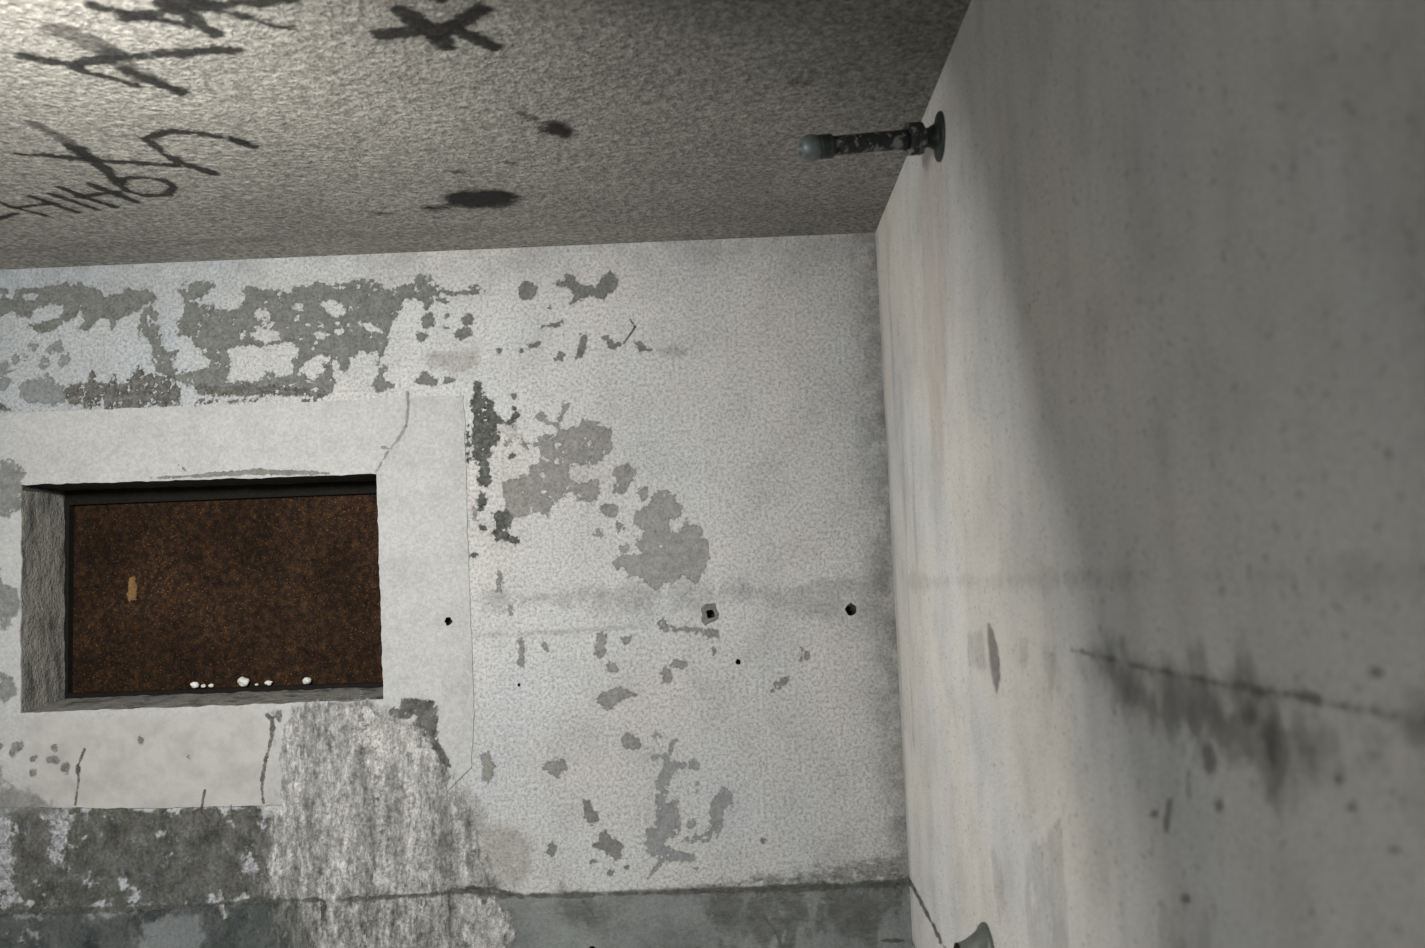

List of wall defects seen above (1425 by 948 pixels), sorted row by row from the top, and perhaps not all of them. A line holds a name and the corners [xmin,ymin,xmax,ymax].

peeling [518,281,538,300]
peeling [556,271,618,305]
peeling [0,274,486,411]
peeling [519,306,563,353]
peeling [554,333,653,361]